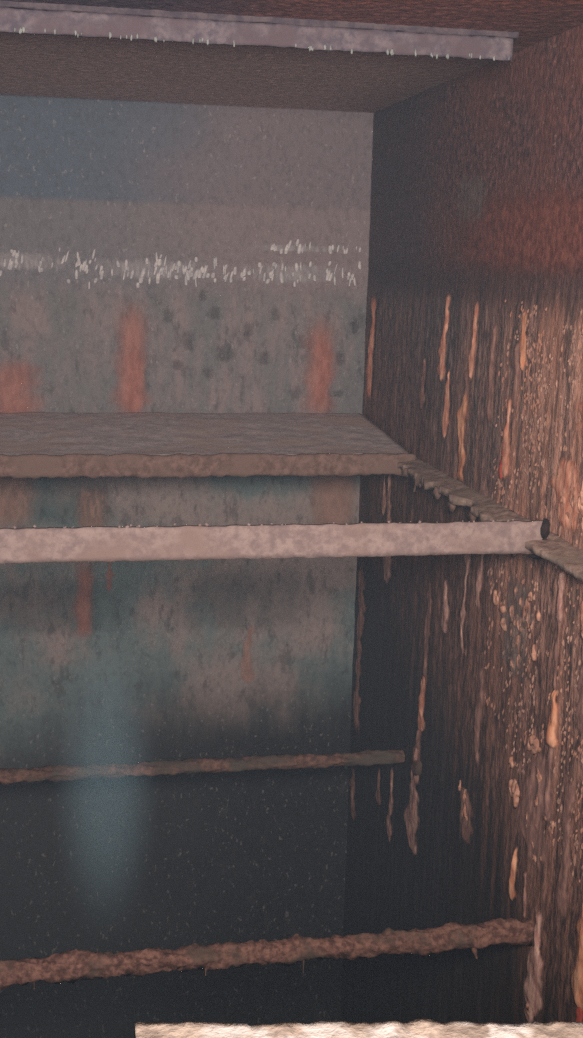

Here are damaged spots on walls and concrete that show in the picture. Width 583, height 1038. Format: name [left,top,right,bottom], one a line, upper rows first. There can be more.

corrosion [366,297,376,397]
corrosion [419,295,479,480]
corrosion [487,325,497,420]
corrosion [499,312,527,479]
corrosion [381,474,391,523]
corrosion [353,567,365,730]
corrosion [375,554,484,854]
corrosion [544,571,565,815]
corrosion [508,848,543,1023]
corrosion [571,898,583,1022]